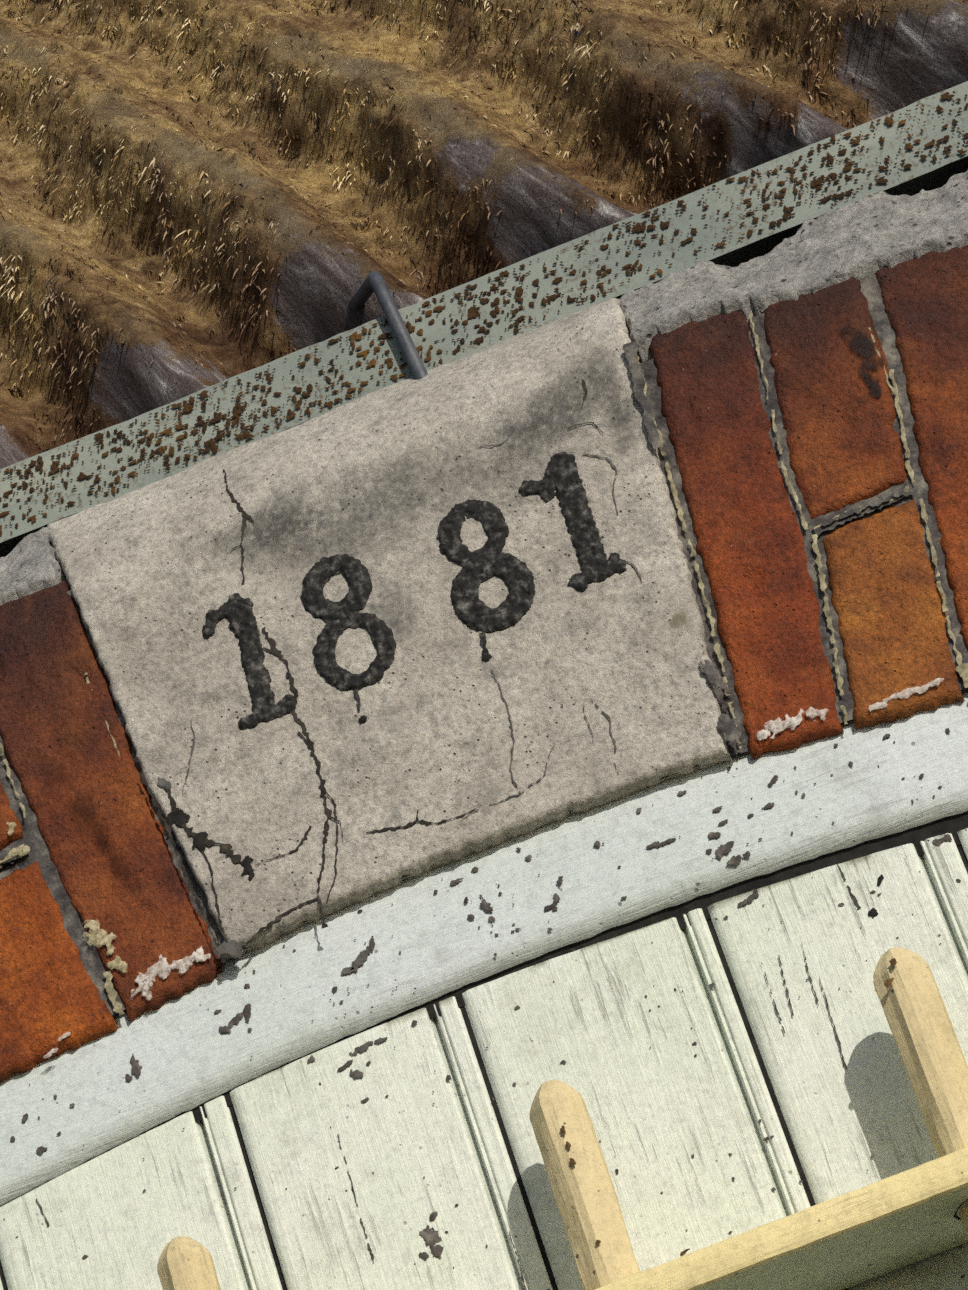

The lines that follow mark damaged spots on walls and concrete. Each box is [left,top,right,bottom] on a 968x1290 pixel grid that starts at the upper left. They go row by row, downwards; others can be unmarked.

corrosion [0,91,968,535]
crack [223,469,254,584]
efflorescence [868,678,944,712]
crack [583,696,619,774]
water stain [717,707,827,750]
crack [139,627,555,963]
peeling [646,836,680,849]
peeling [706,806,751,864]
peeling [464,897,495,922]
peeling [544,878,563,911]
water stain [131,946,211,1000]
peeling [419,1245,443,1260]